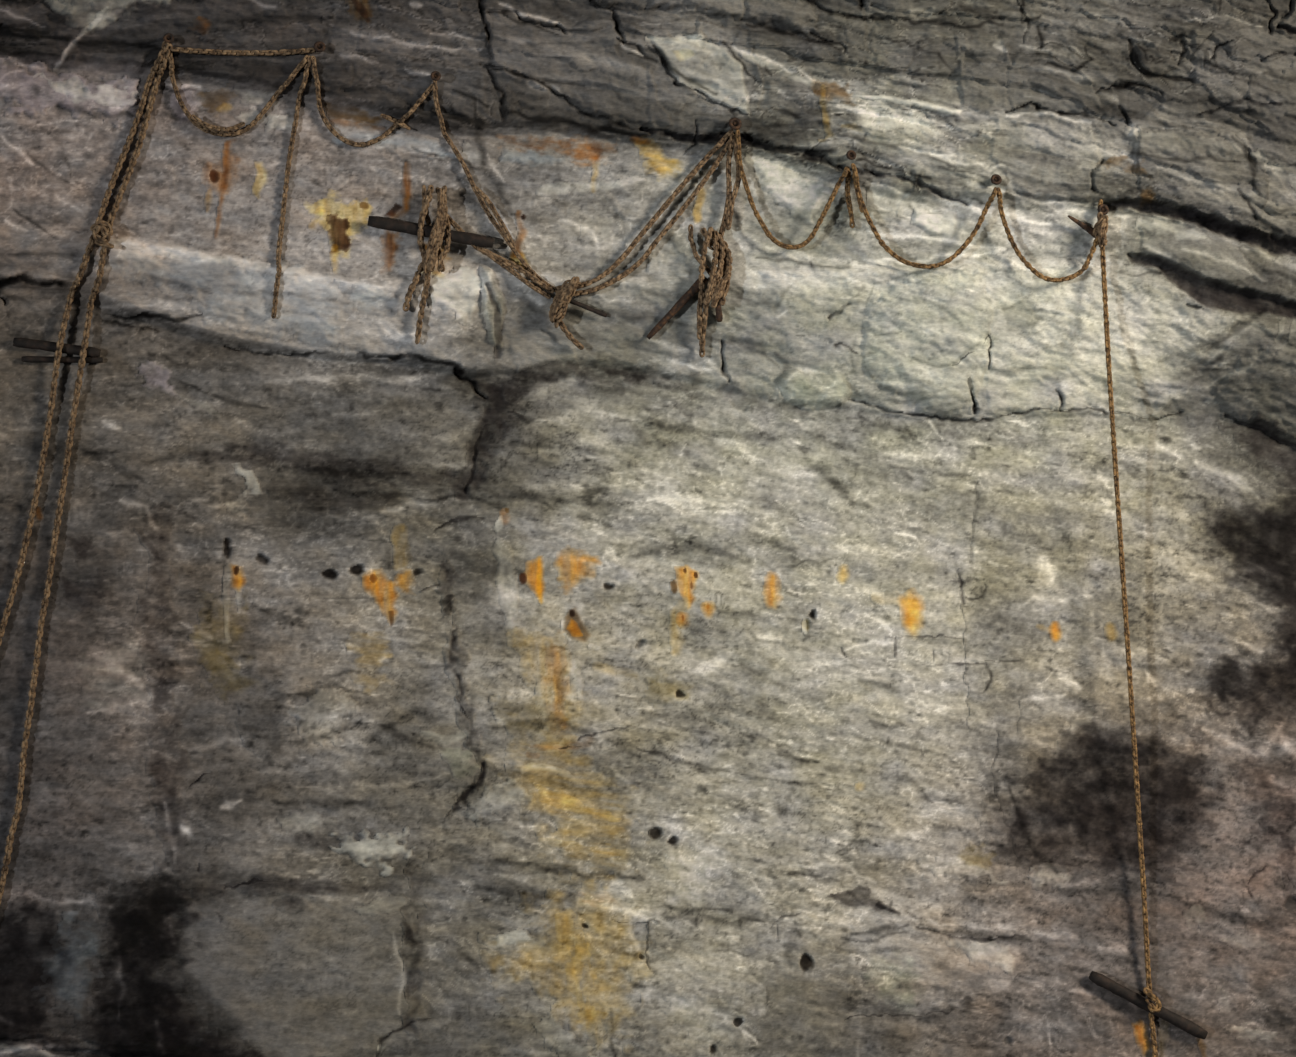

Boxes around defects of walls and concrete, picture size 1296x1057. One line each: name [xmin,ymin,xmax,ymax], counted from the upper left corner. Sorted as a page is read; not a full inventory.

crack [479,0,972,208]
rust [303,161,414,276]
crack [102,312,204,333]
crack [131,500,276,926]
damp [292,828,376,853]
crack [224,345,529,821]
rust [362,523,418,628]
rust [479,545,718,1056]
rust [870,587,927,641]
damp [976,410,1296,915]
damp [0,864,407,1057]
crack [377,852,434,1057]